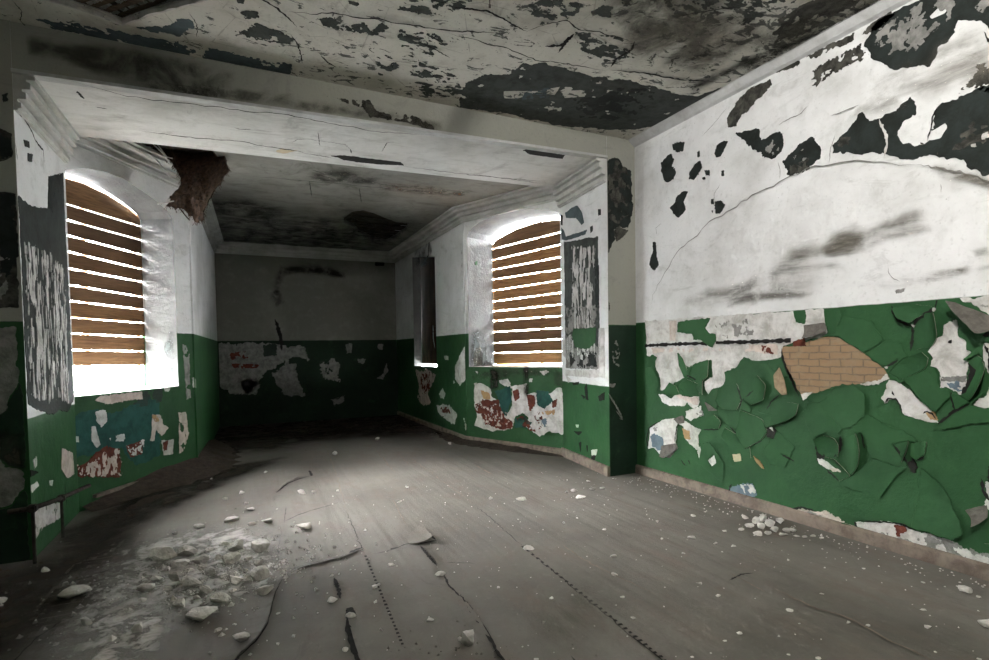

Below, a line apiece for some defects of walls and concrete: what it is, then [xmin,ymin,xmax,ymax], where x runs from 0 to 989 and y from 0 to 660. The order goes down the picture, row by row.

peeling [319,17,720,130]
peeling [714,0,989,176]
peeling [661,141,685,182]
peeling [670,191,688,218]
peeling [689,151,724,180]
peeling [711,199,725,214]
crack [652,105,989,301]
flaking render [219,342,341,397]
flaking render [415,327,605,460]
peeling [638,295,989,498]
peeling [35,388,189,538]
peeling [792,466,989,564]